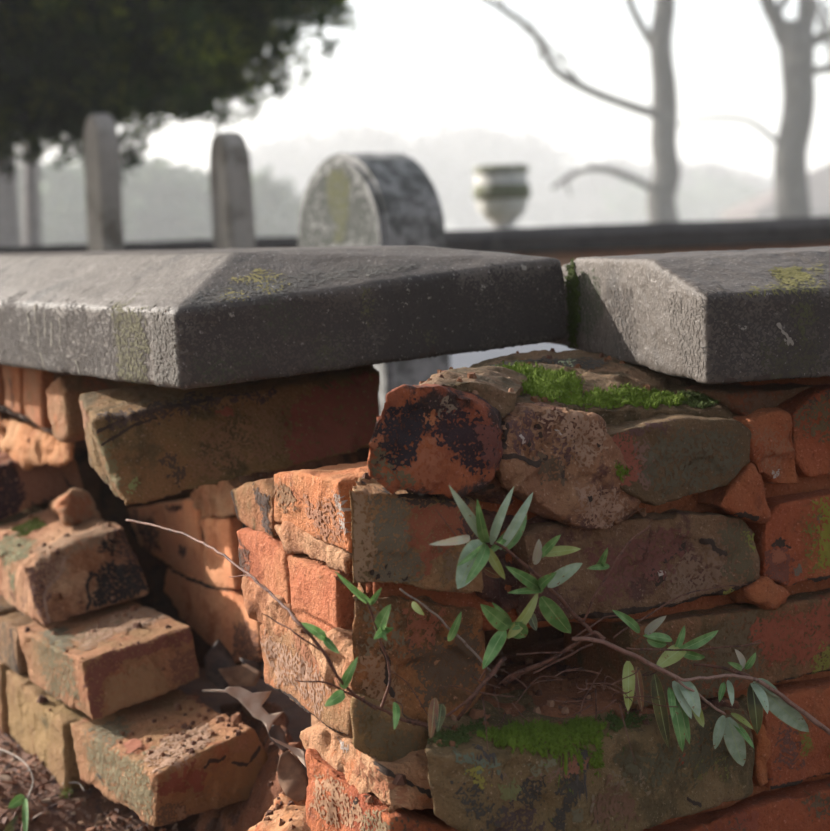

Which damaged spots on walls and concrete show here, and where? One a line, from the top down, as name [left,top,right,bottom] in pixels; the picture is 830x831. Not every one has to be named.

spalling [394,409,456,490]
spalling [23,523,117,624]
crack [170,568,228,592]
spalling [403,502,472,581]
crack [203,746,261,769]